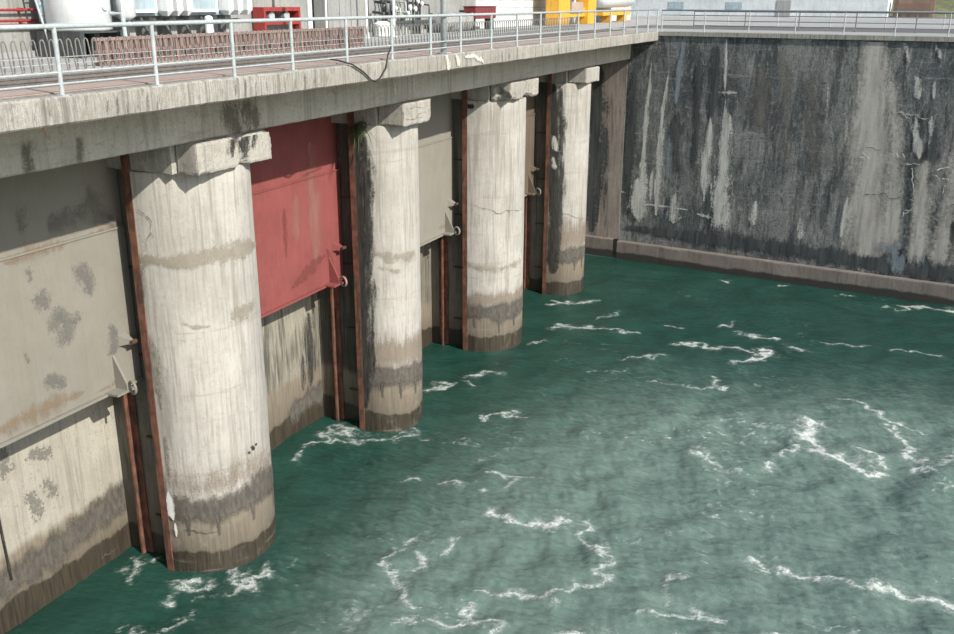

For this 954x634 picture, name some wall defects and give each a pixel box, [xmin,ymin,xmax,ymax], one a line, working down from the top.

water stain [547,65,609,274]
water stain [621,38,954,283]
water stain [354,130,423,409]
water stain [0,448,15,481]
water stain [28,446,52,461]
water stain [0,477,127,600]
water stain [164,448,274,536]